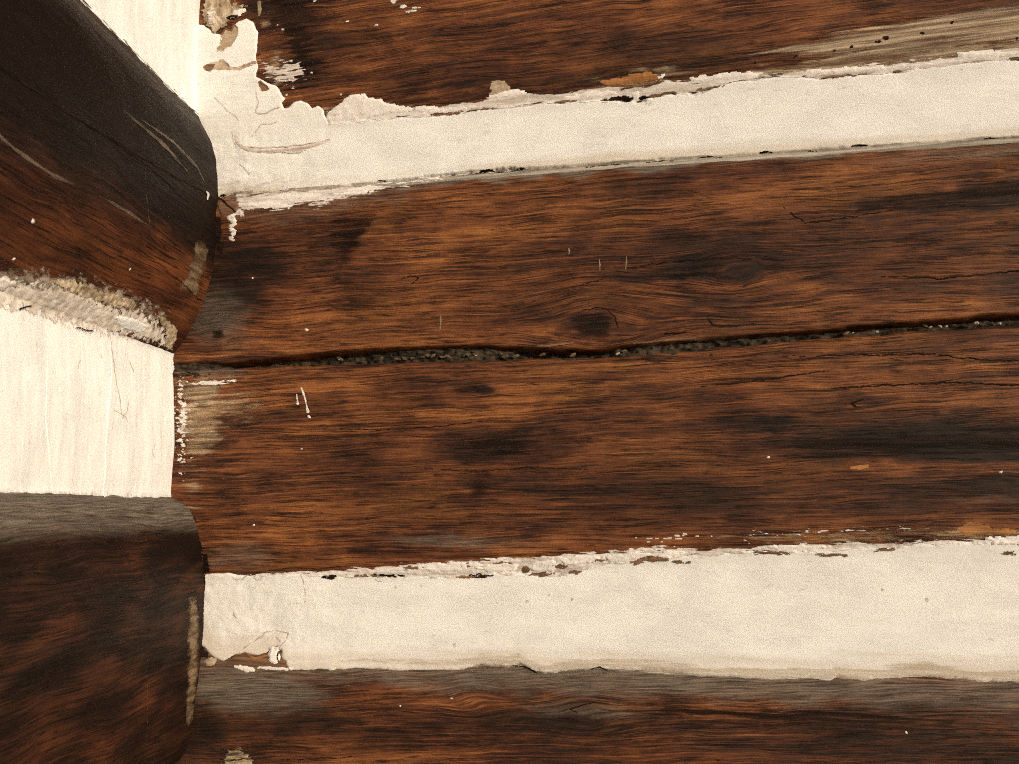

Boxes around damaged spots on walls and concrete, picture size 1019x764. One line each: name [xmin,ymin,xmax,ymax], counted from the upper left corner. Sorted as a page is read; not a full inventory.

spalling [201,0,286,71]
peeling [217,176,443,217]